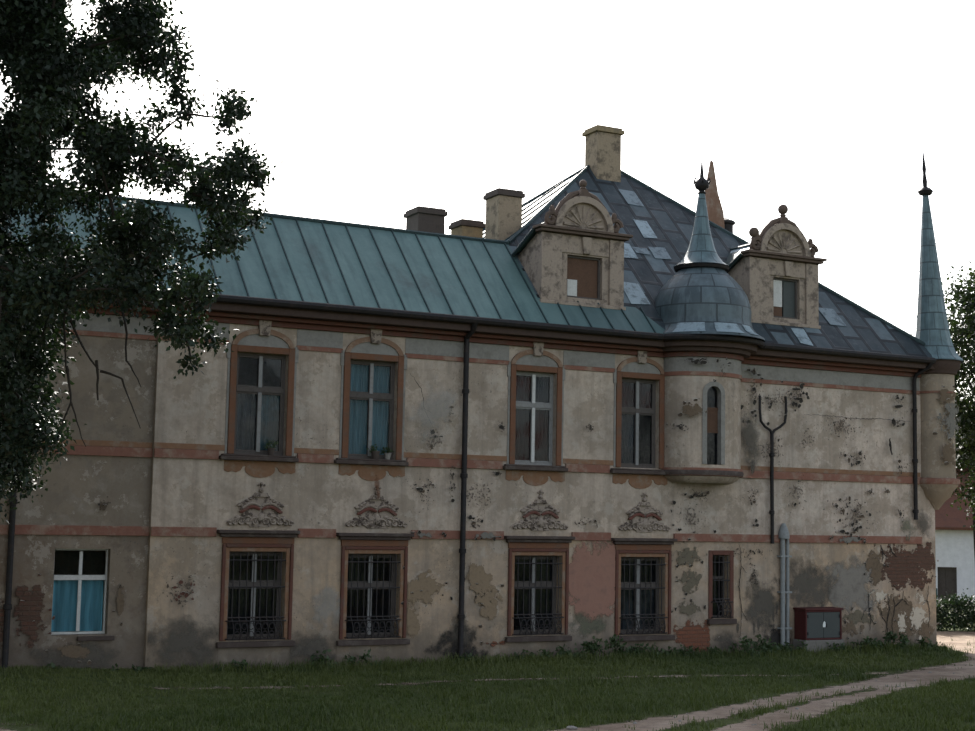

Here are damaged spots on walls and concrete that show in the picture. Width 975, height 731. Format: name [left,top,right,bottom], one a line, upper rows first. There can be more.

flaking render [670,398,707,433]
flaking render [741,368,810,426]
flaking render [14,574,55,648]
flaking render [166,571,210,607]
flaking render [397,569,453,637]
damp [427,620,488,659]
flaking render [465,562,505,628]
flaking render [661,489,720,654]
flaking render [823,488,939,643]